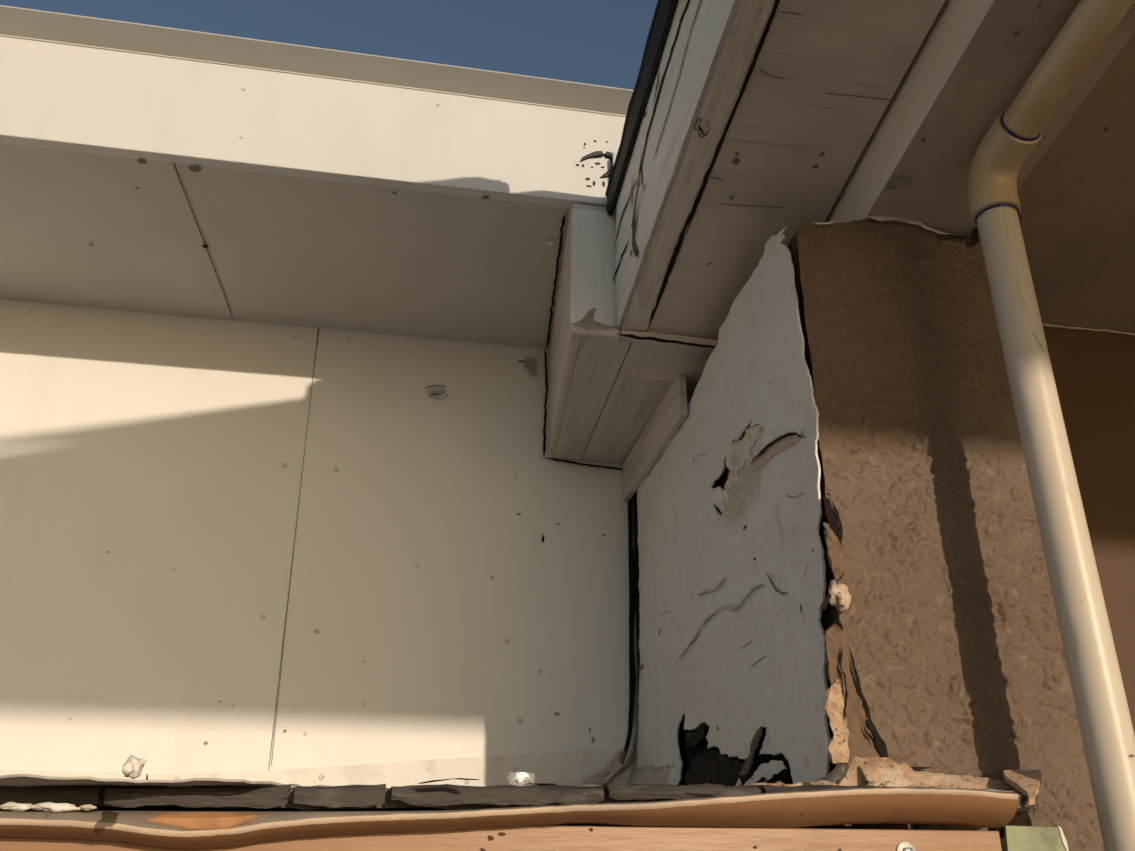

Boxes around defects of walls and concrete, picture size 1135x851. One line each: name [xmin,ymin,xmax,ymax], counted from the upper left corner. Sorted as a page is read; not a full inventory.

crack [826,93,894,101]
crack [617,0,803,348]
crack [613,216,628,280]
peeling [748,427,804,472]
spalling [678,522,1021,794]
peeling [0,774,301,788]
peeling [0,802,97,813]